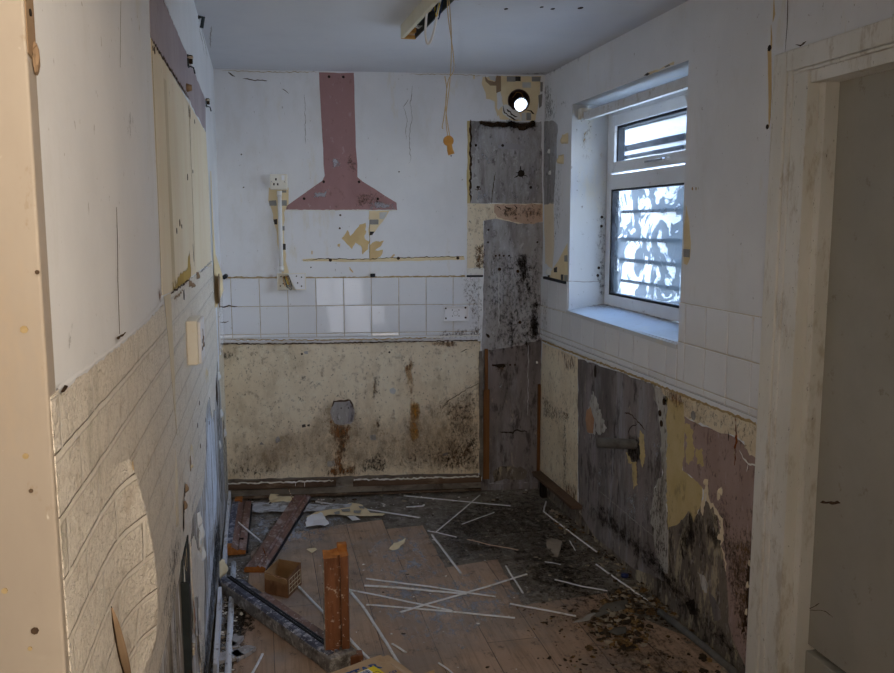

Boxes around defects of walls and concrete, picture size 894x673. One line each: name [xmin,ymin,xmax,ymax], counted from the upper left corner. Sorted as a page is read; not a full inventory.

flaking render [149,0,212,300]
flaking render [268,72,397,273]
peeling [473,76,534,121]
flaking render [159,361,256,673]
corrosion [328,420,355,476]
water stain [400,387,479,470]
flaking render [578,359,666,582]
water stain [580,501,745,673]
flaking render [683,416,756,666]